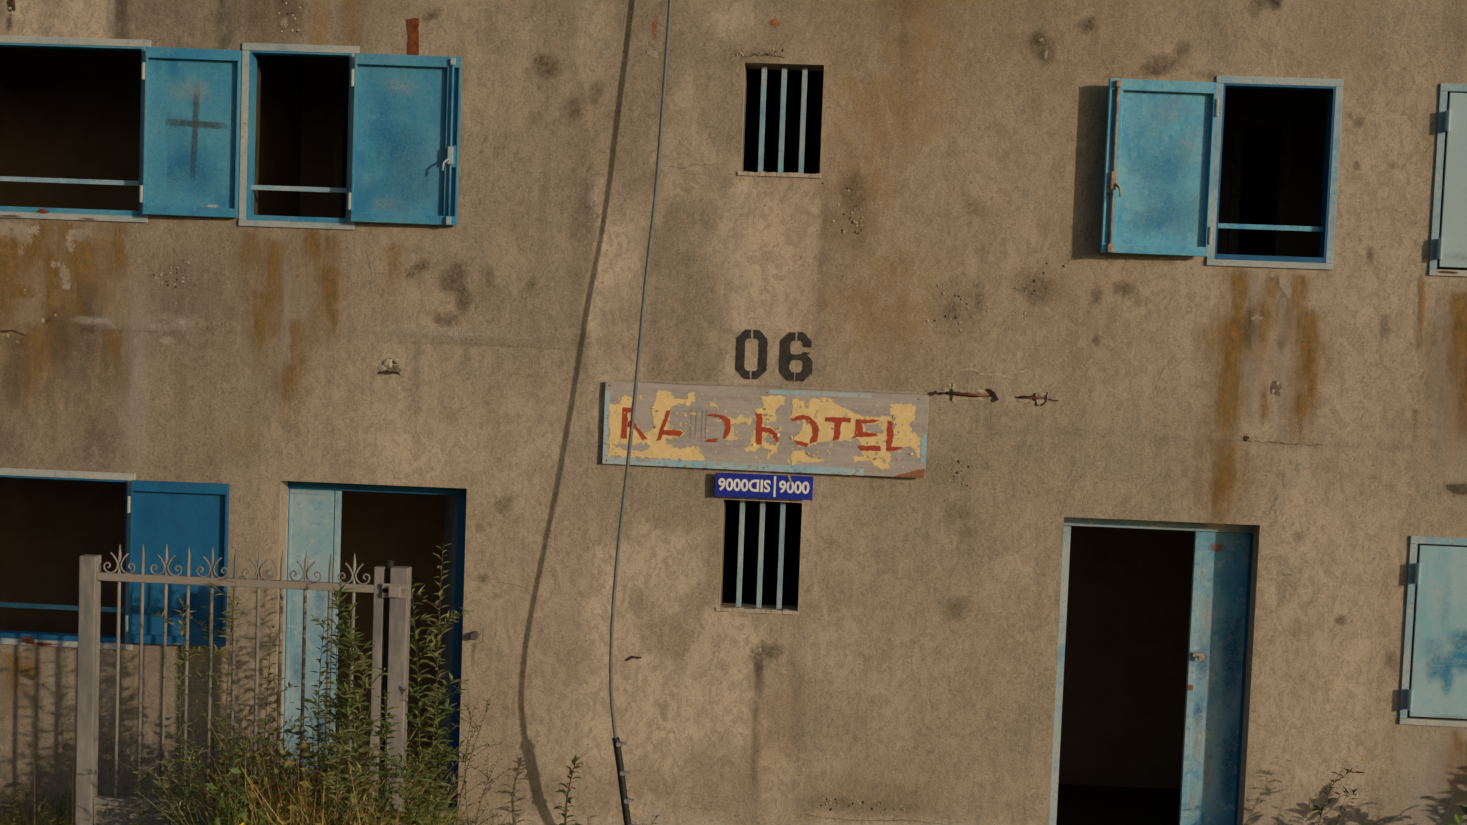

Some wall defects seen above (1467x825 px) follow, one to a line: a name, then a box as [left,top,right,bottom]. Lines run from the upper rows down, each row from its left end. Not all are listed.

corrosion [407,18,419,55]